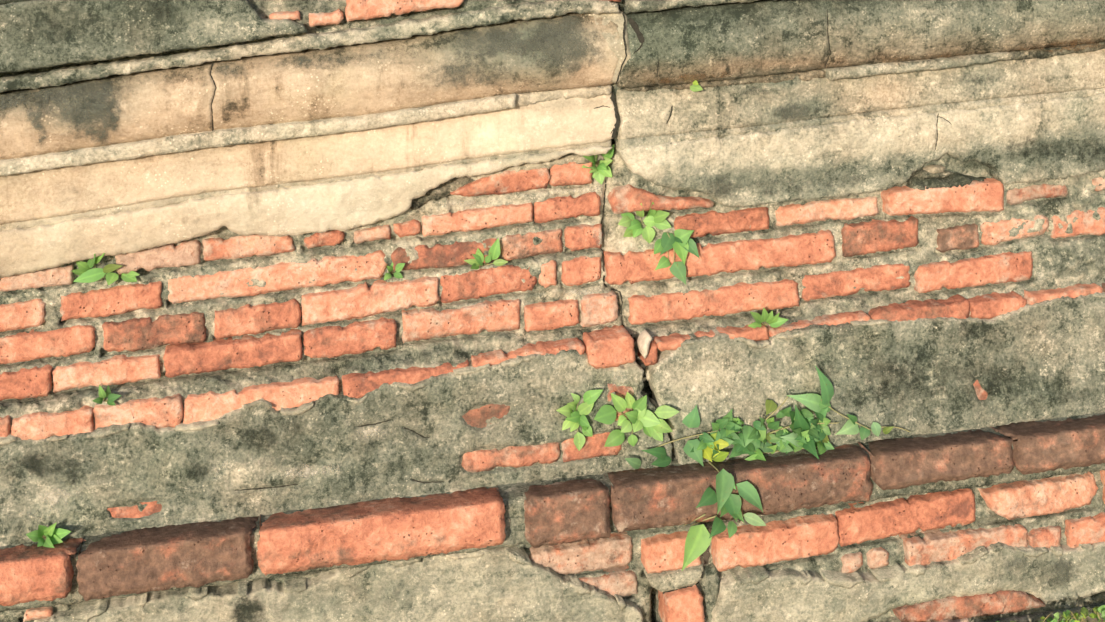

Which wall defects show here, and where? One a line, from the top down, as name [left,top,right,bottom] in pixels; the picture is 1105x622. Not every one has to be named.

flaking render [248,0,546,38]
damp [0,81,121,143]
crack [209,62,217,131]
crack [594,4,659,138]
flaking render [0,140,1105,446]
crack [600,180,666,421]
flaking render [461,384,634,473]
flaking render [446,550,484,560]
flaking render [504,470,1105,622]
flaking render [0,599,108,622]